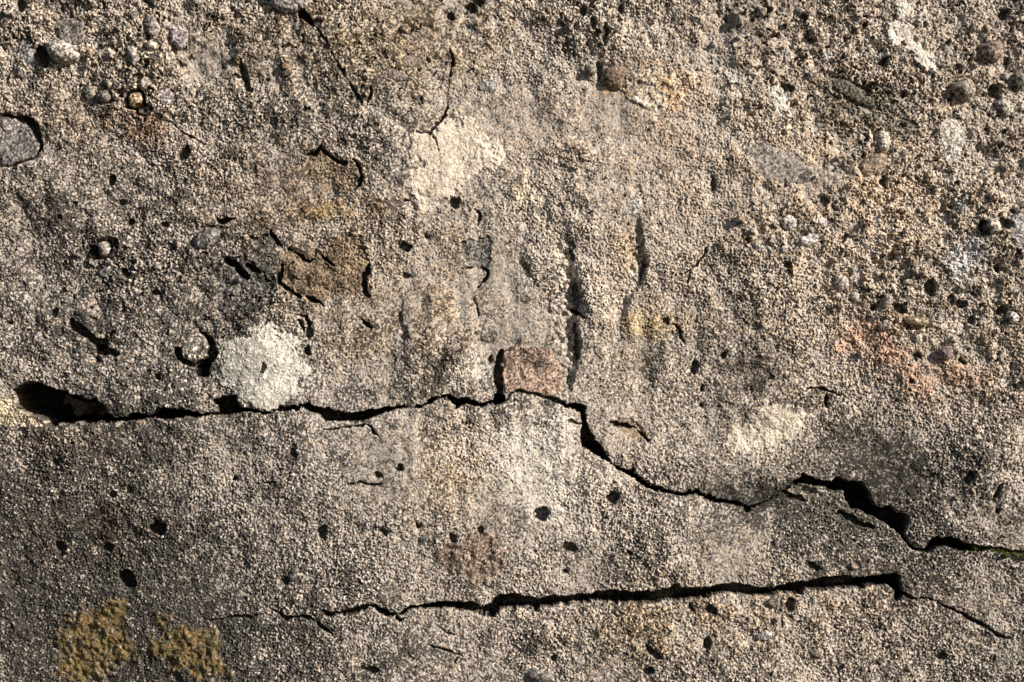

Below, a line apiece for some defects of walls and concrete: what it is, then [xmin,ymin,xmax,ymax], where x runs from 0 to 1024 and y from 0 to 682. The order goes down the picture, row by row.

crack [15,323,743,506]
crack [806,387,839,402]
crack [768,473,1024,558]
crack [223,573,1010,661]